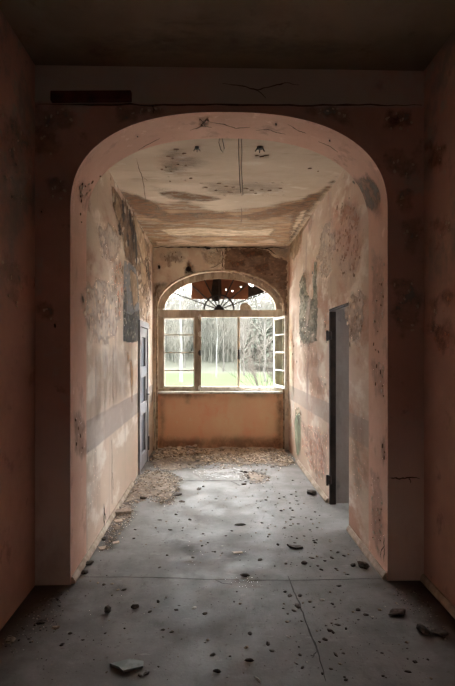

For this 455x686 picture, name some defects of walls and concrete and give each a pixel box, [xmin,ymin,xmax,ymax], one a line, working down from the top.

crack [49,82,416,113]
flaking render [82,187,195,344]
damp [123,181,335,259]
flaking render [223,247,288,311]
flaking render [292,262,327,370]
crack [288,577,326,681]